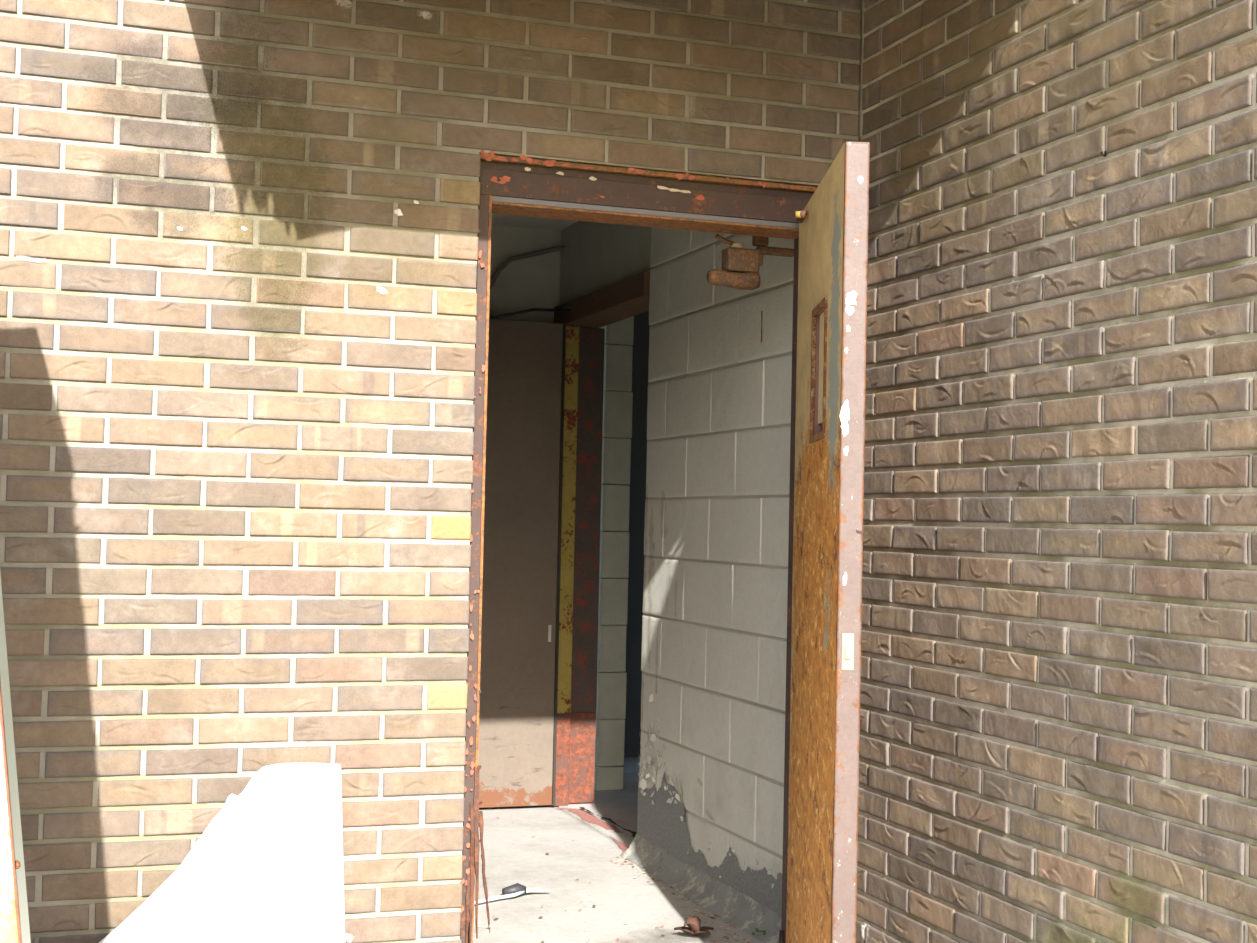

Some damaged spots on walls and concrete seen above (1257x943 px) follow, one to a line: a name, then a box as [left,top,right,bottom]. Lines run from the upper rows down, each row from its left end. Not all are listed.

corrosion [466,767,490,943]
peeling [637,717,782,916]